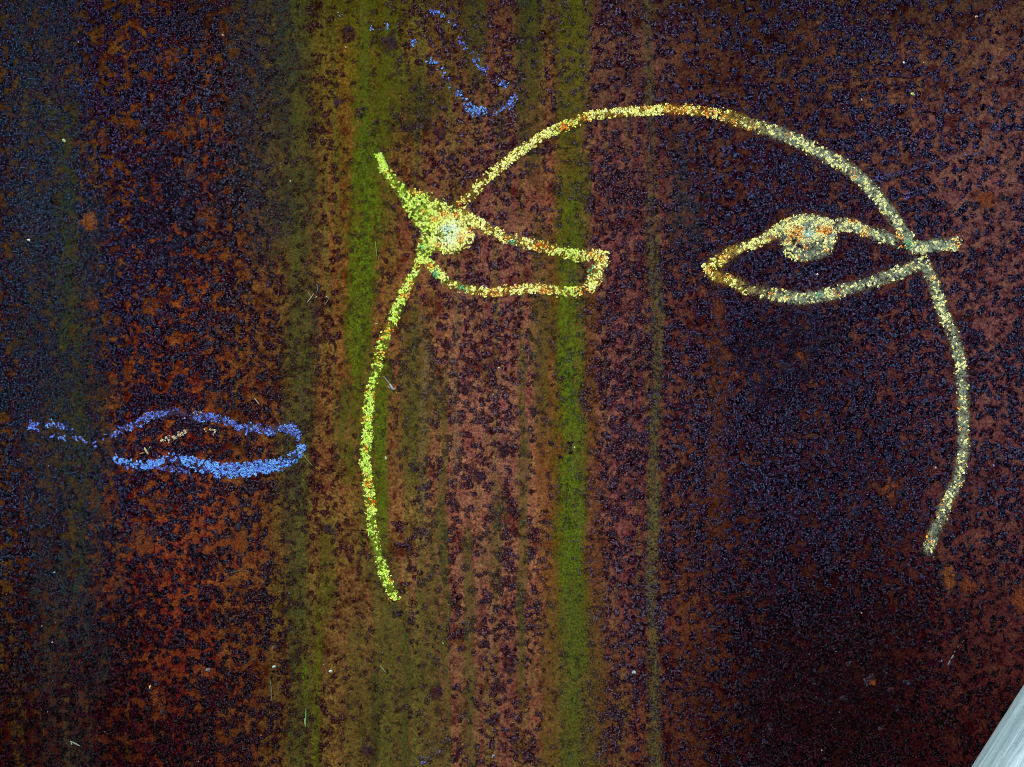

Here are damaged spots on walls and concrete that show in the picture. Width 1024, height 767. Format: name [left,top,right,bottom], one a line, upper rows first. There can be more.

rust [81,207,102,238]